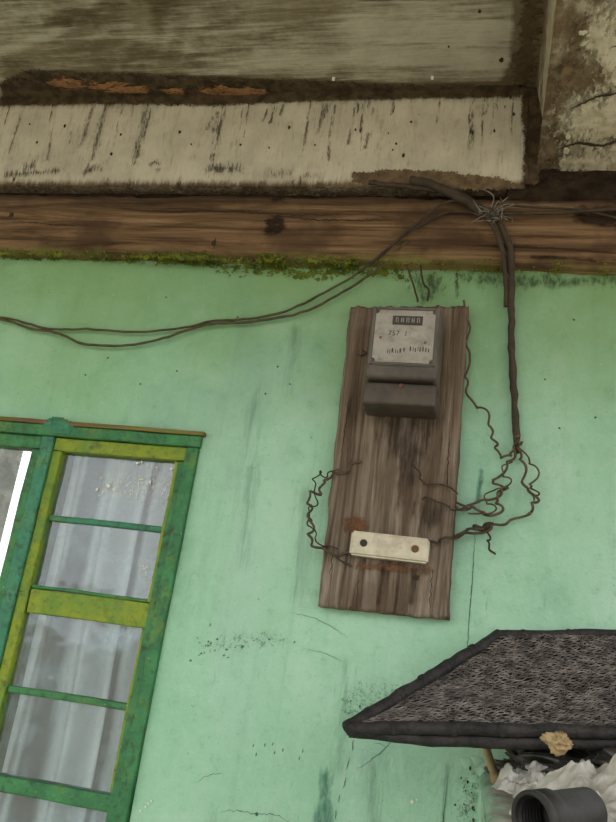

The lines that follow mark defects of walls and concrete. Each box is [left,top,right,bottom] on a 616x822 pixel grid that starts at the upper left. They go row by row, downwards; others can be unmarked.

water stain [47,3,123,27]
spalling [0,0,544,99]
crack [571,93,616,109]
water stain [4,143,59,181]
water stain [80,103,110,175]
water stain [132,104,151,164]
water stain [208,152,241,175]
water stain [303,102,336,161]
crack [521,87,542,187]
crack [560,140,616,149]
water stain [314,773,331,822]